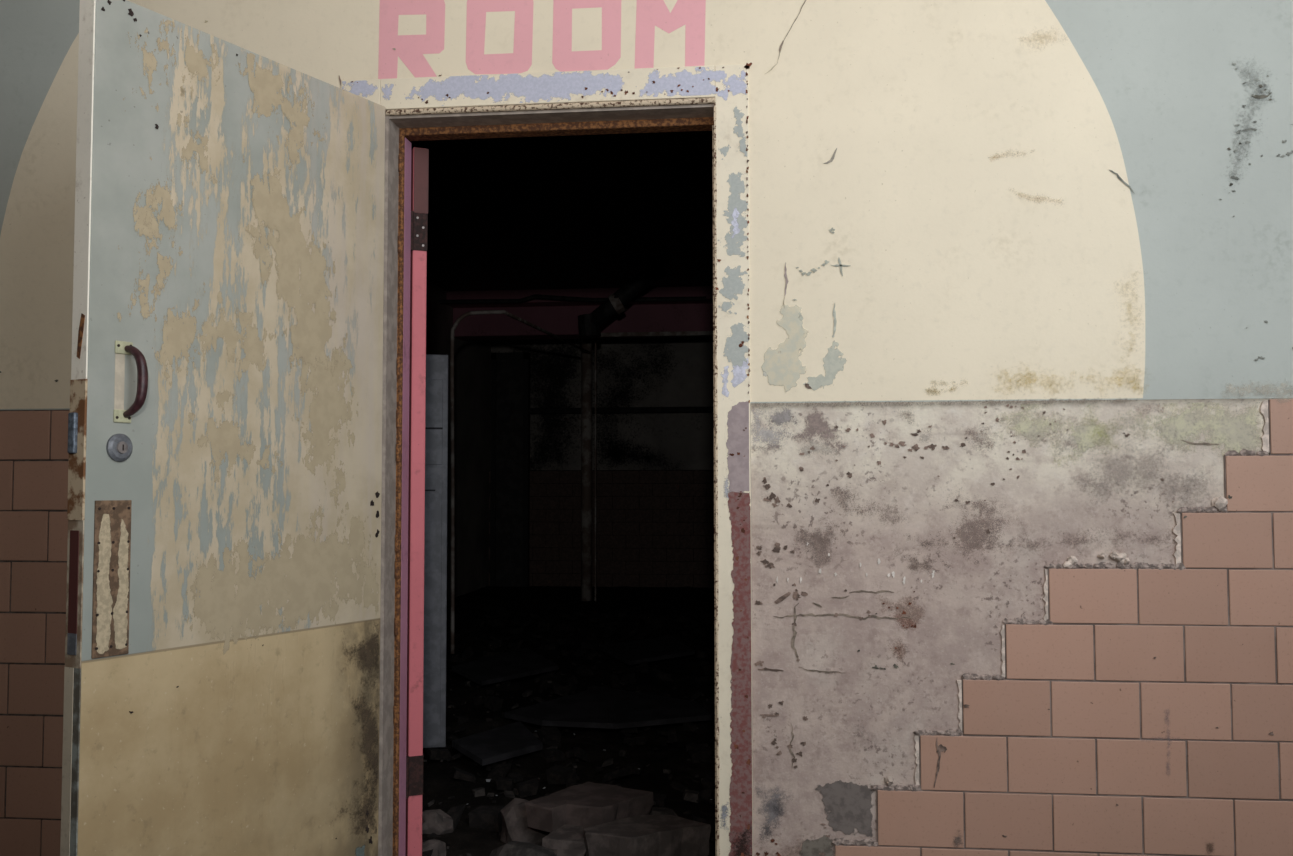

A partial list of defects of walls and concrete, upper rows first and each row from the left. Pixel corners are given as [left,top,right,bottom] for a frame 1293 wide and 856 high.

crack [765,0,806,74]
peeling [342,71,625,106]
peeling [640,67,748,160]
spalling [715,172,1293,856]